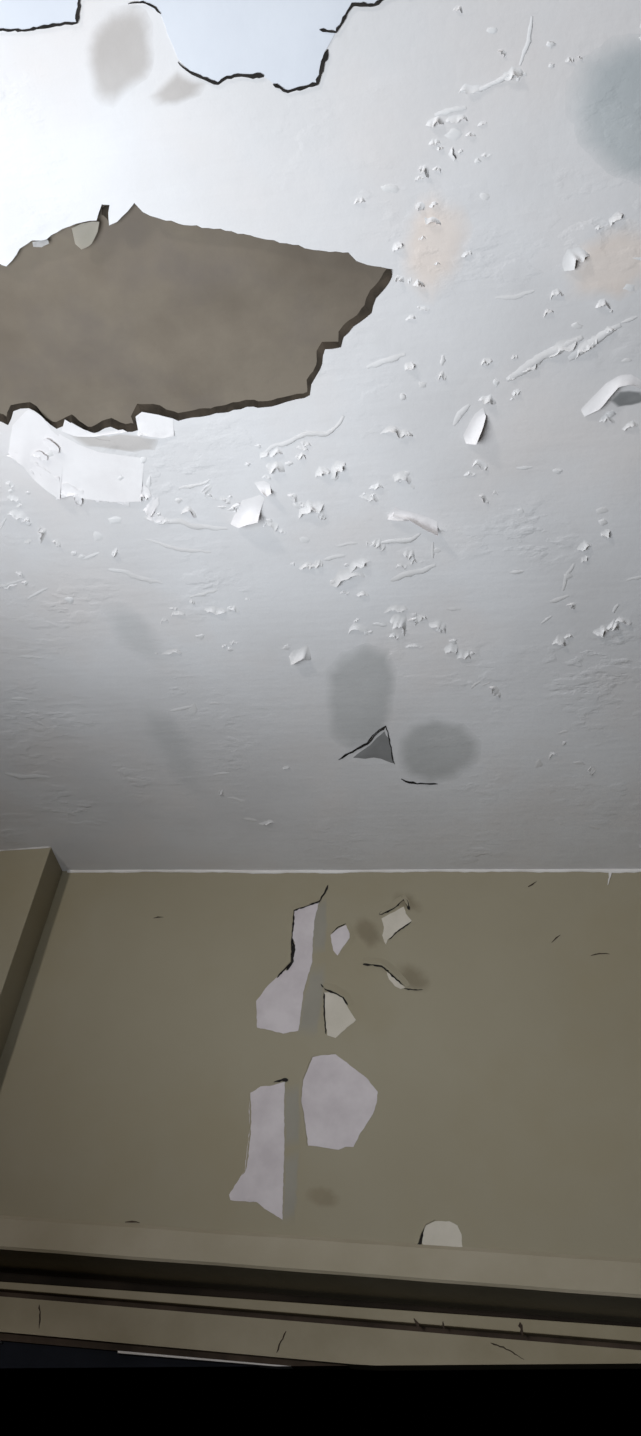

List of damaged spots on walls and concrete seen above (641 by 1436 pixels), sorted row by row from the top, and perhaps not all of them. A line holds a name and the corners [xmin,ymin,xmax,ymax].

peeling [415,16,582,180]
water stain [565,33,641,186]
peeling [562,247,590,271]
spalling [0,203,424,584]
peeling [453,298,638,476]
peeling [290,471,441,597]
peeling [348,604,475,659]
peeling [593,604,632,637]
water stain [322,643,482,788]
peeling [363,894,422,990]
peeling [229,885,378,1219]
peeling [414,1217,462,1247]